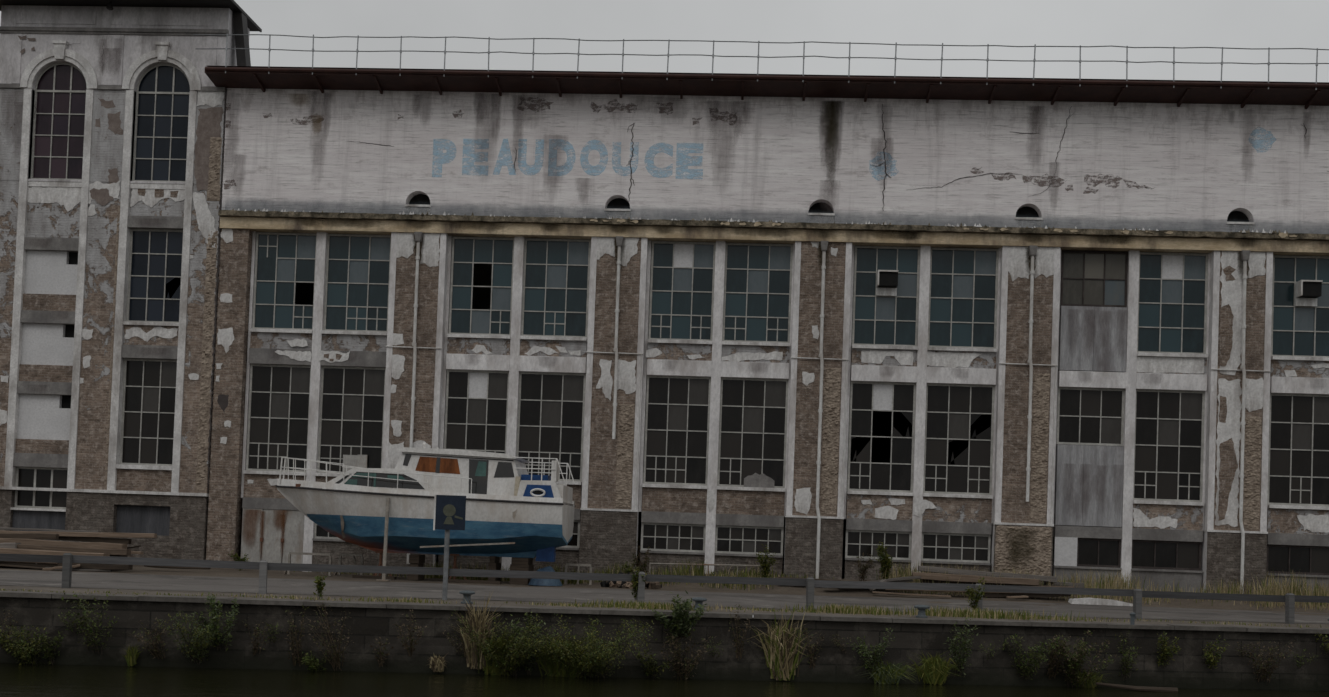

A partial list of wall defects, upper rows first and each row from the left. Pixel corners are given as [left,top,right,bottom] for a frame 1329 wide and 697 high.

peeling [290,115,325,125]
crack [627,123,635,199]
crack [873,104,1074,211]
spalling [28,91,236,492]
spalling [596,348,662,509]
peeling [1214,251,1266,530]
peeling [1133,508,1178,529]
peeling [1297,514,1329,533]